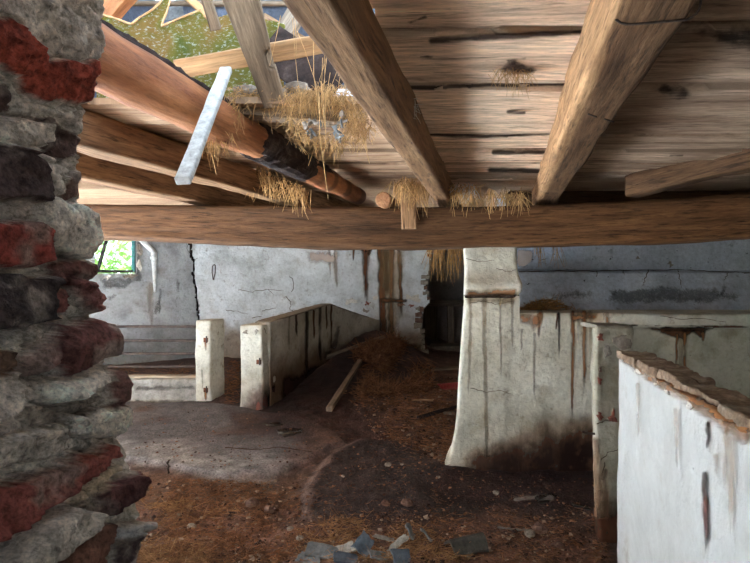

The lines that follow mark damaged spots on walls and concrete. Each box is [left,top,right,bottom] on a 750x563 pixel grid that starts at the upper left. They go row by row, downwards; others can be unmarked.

crack [186,243,199,320]
damp [245,305,332,410]
spalling [397,275,430,354]
rust [520,311,543,336]
rust [571,310,597,409]
peeling [597,333,750,441]
rust [650,326,713,366]
damp [465,420,617,543]